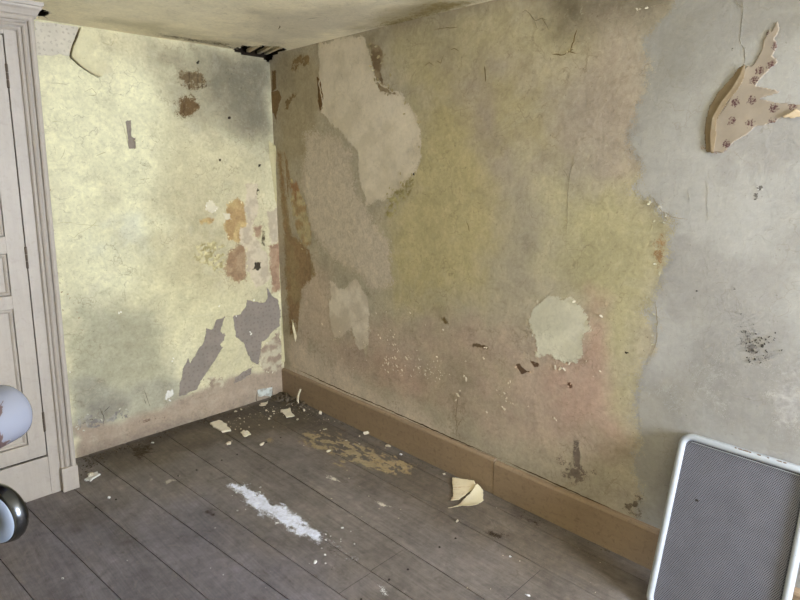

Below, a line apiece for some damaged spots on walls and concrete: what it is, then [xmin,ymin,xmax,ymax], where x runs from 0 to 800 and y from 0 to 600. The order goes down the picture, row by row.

damp [152,32,296,123]
crack [554,30,577,56]
peeling [125,120,137,149]
flaking render [192,141,281,294]
flaking render [299,35,450,382]
flaking render [621,0,800,529]
flaking render [259,305,297,375]
flaking render [515,295,594,374]
flaking render [256,387,273,401]
damp [629,324,800,459]
damp [556,440,596,489]